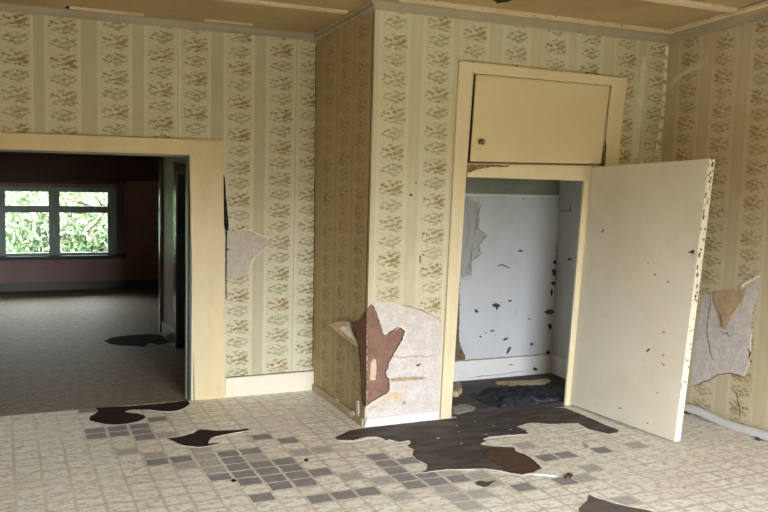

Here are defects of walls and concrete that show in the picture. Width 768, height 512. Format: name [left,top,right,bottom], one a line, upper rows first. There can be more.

flaking render [329,301,442,418]